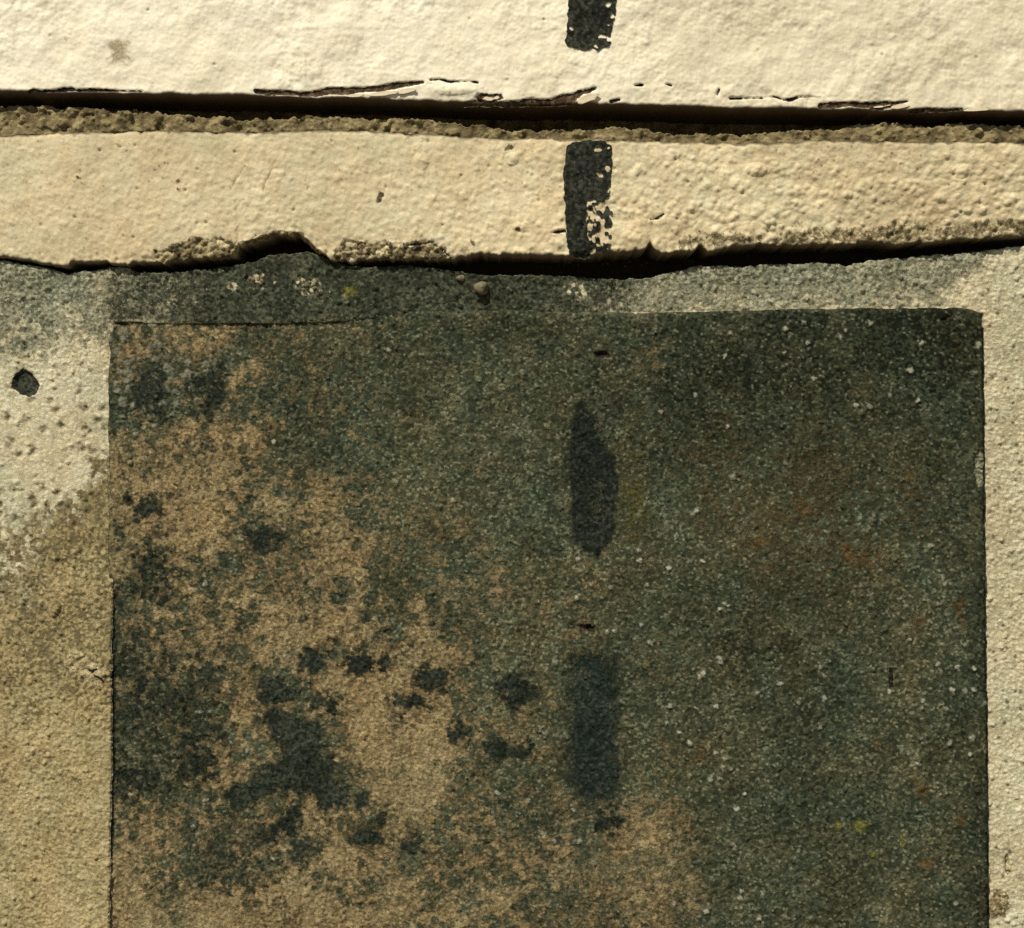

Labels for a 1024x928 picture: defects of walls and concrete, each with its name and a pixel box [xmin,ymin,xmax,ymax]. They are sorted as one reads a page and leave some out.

crack [28,86,142,94]
peeling [254,81,424,97]
peeling [464,87,599,108]
crack [609,84,672,103]
crack [717,89,798,102]
crack [12,241,452,273]
spalling [152,230,447,264]
water stain [0,250,990,928]